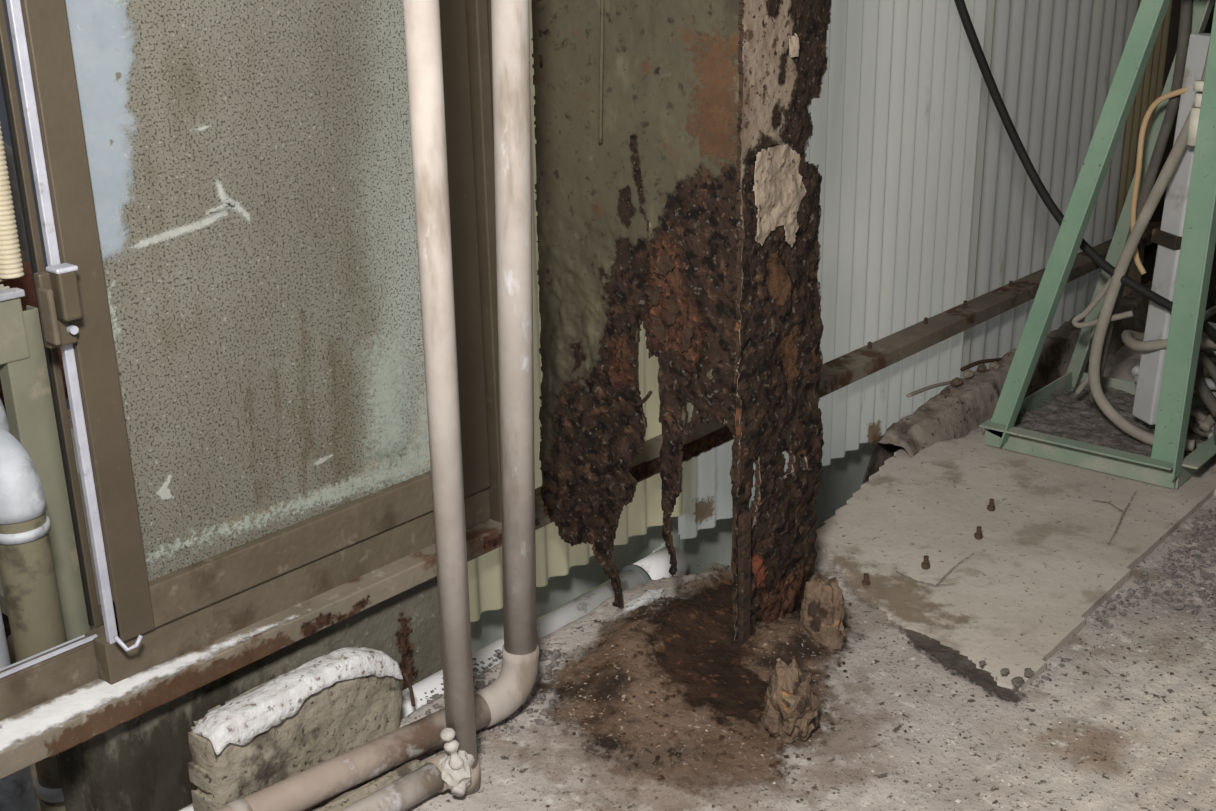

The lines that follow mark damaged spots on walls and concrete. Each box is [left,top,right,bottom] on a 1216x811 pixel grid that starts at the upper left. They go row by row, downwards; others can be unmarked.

peeling [789,33,799,57]
peeling [753,144,807,247]
corrosion [535,0,832,725]
crack [1092,494,1135,544]
corrosion [44,595,370,757]
corrosion [395,613,418,690]